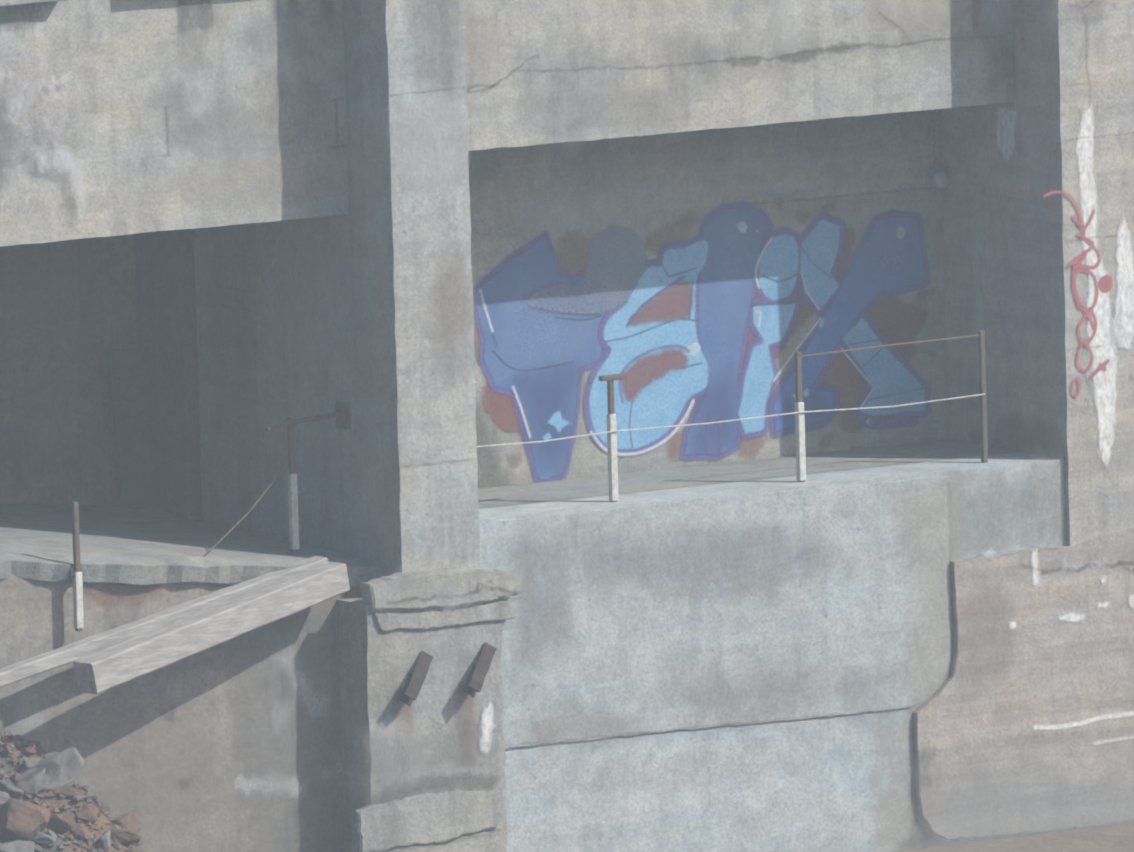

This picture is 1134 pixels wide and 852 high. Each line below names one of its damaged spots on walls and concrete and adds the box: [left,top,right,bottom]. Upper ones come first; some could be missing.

spalling [355,790,499,852]